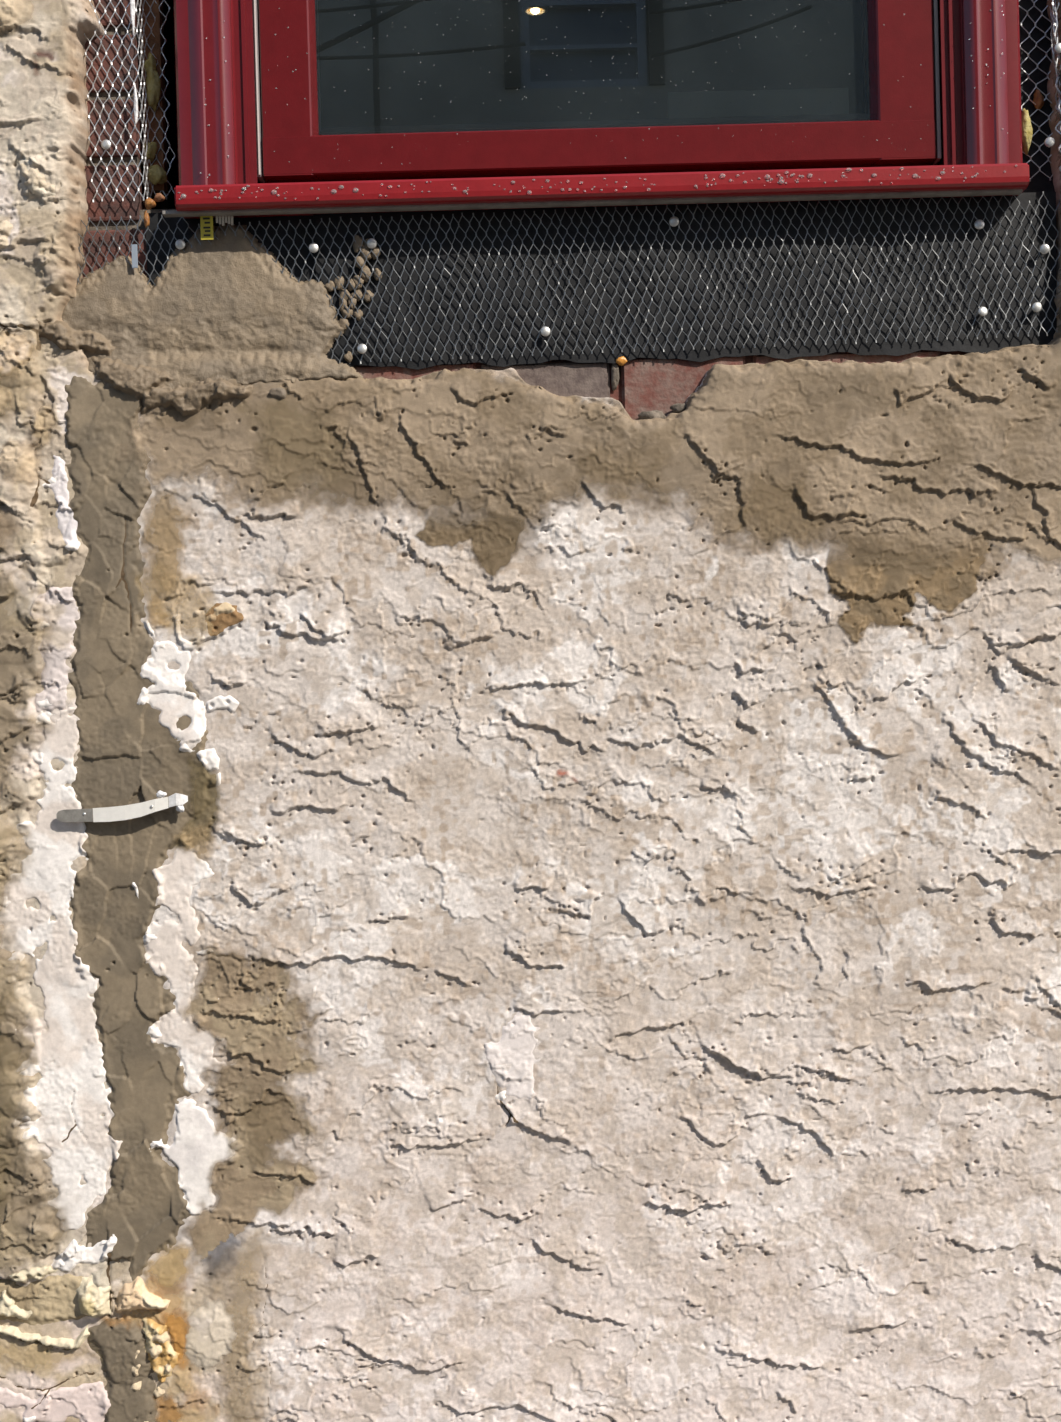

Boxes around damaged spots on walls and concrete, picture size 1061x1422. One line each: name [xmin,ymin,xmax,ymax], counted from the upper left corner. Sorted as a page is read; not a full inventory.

spalling [352,350,940,420]
peeling [42,455,80,551]
peeling [137,602,244,786]
peeling [0,587,180,1398]
peeling [143,847,235,1215]
corrosion [159,1309,188,1365]
peeling [0,1381,111,1422]